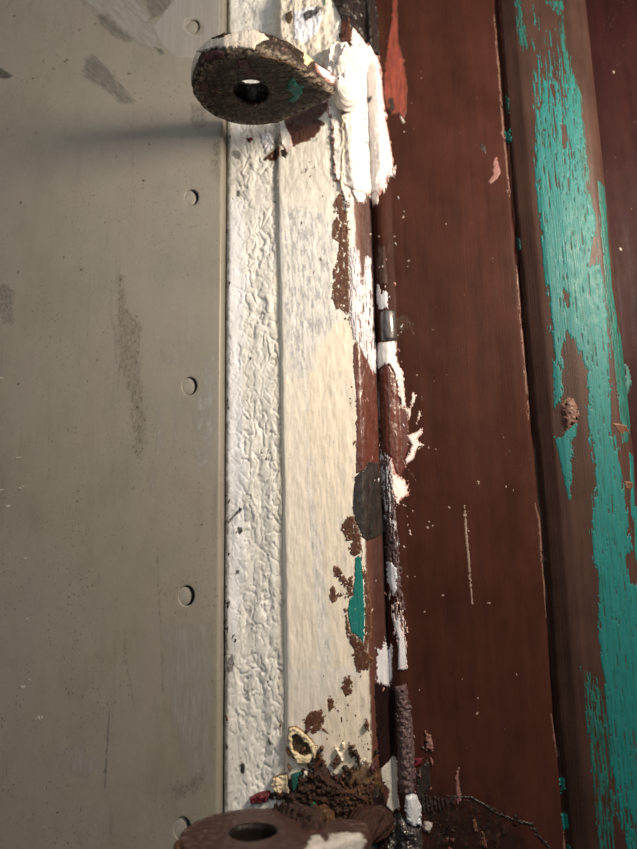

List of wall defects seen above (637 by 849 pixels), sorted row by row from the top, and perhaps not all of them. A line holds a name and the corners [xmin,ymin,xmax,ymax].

peeling [340,18,351,46]
peeling [331,188,351,320]
peeling [353,342,421,477]
peeling [514,0,637,849]
peeling [329,516,376,697]
peeling [388,591,408,648]
peeling [302,696,336,734]
corrosion [269,702,386,819]
peeling [306,832,389,849]
peeling [373,792,395,818]